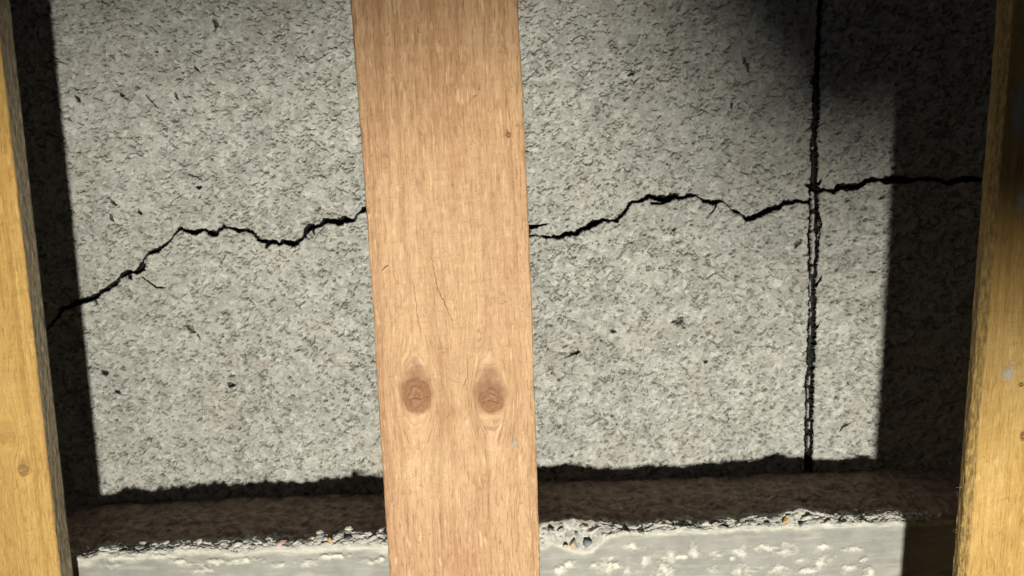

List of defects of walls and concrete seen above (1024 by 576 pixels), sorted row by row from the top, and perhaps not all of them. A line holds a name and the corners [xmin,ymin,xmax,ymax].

crack [46,207,366,330]
crack [529,176,983,240]